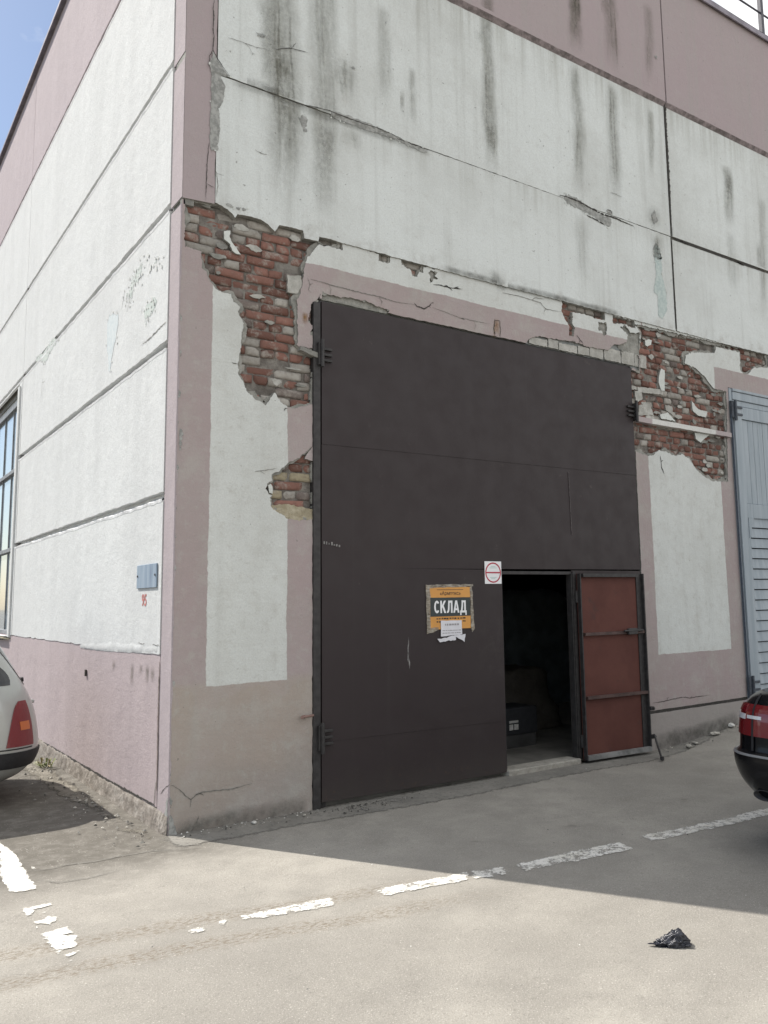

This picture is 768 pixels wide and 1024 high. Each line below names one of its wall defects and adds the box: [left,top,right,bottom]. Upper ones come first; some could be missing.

peeling [209,52,232,151]
peeling [564,192,612,228]
spalling [184,201,389,408]
spalling [379,255,437,282]
spalling [525,243,767,482]
spalling [266,447,313,521]
crack [154,678,252,832]